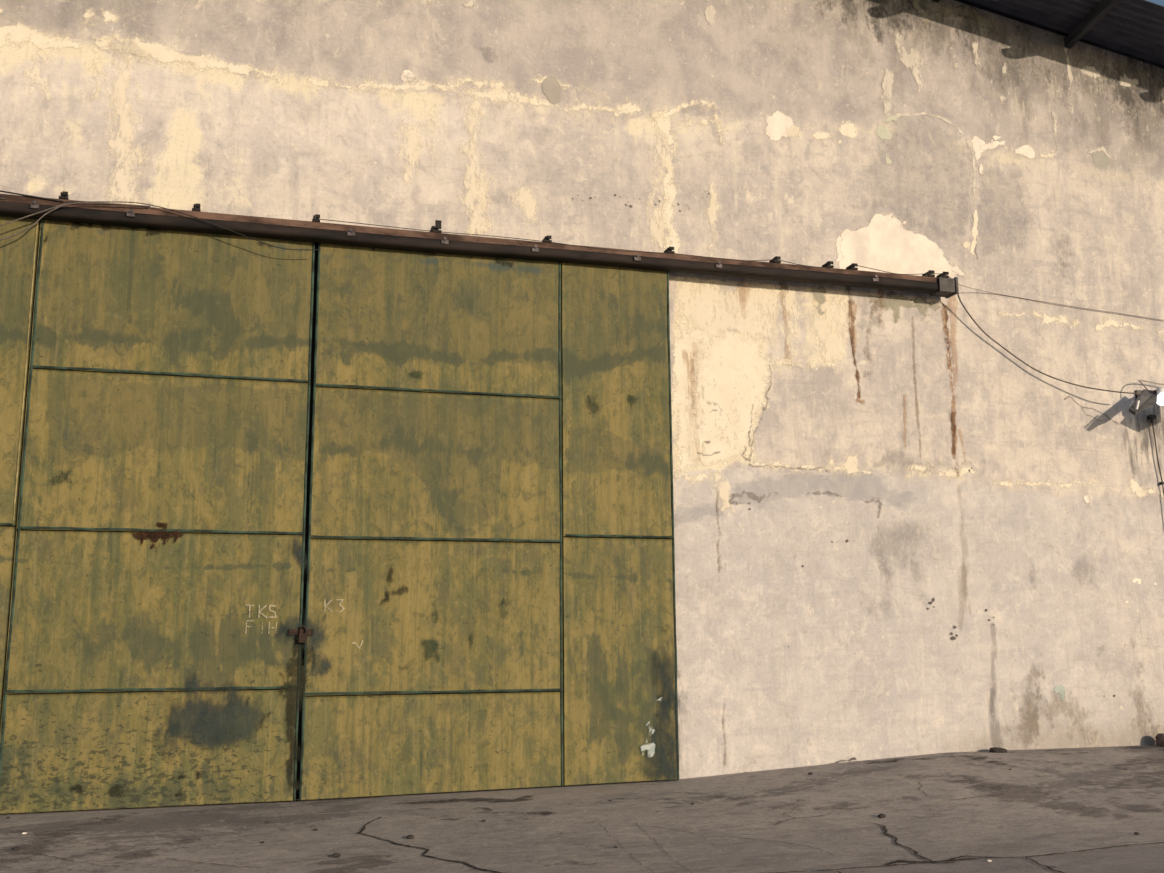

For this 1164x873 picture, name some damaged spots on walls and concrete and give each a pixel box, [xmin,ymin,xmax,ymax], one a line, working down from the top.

damp [895,33,924,92]
damp [1064,47,1102,86]
damp [1120,74,1139,87]
peeling [765,111,856,144]
peeling [971,135,1054,174]
peeling [836,213,964,278]
peeling [671,279,871,511]
rust [848,300,864,404]
rust [942,304,957,458]
rust [132,522,184,551]
crack [174,817,503,873]
crack [724,812,1164,873]